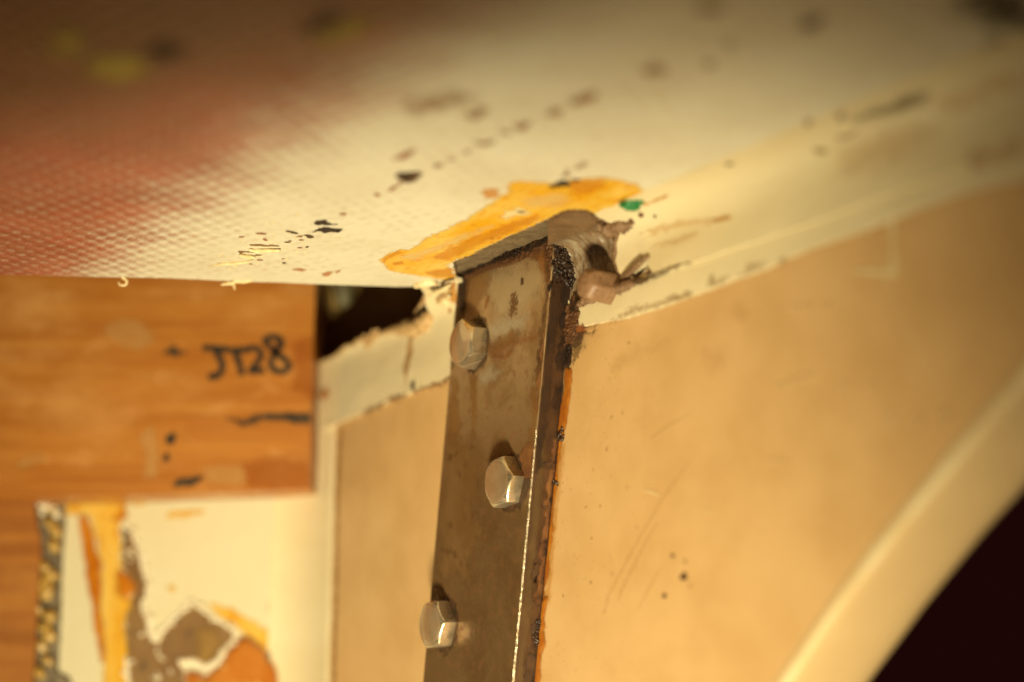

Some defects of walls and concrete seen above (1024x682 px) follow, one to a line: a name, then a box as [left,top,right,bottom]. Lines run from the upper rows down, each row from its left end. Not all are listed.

spalling [375,172,422,197]
spalling [547,162,587,188]
spalling [413,278,457,312]
corrosion [363,336,462,453]
corrosion [454,236,596,682]
peeling [121,520,237,682]
corrosion [435,586,458,656]